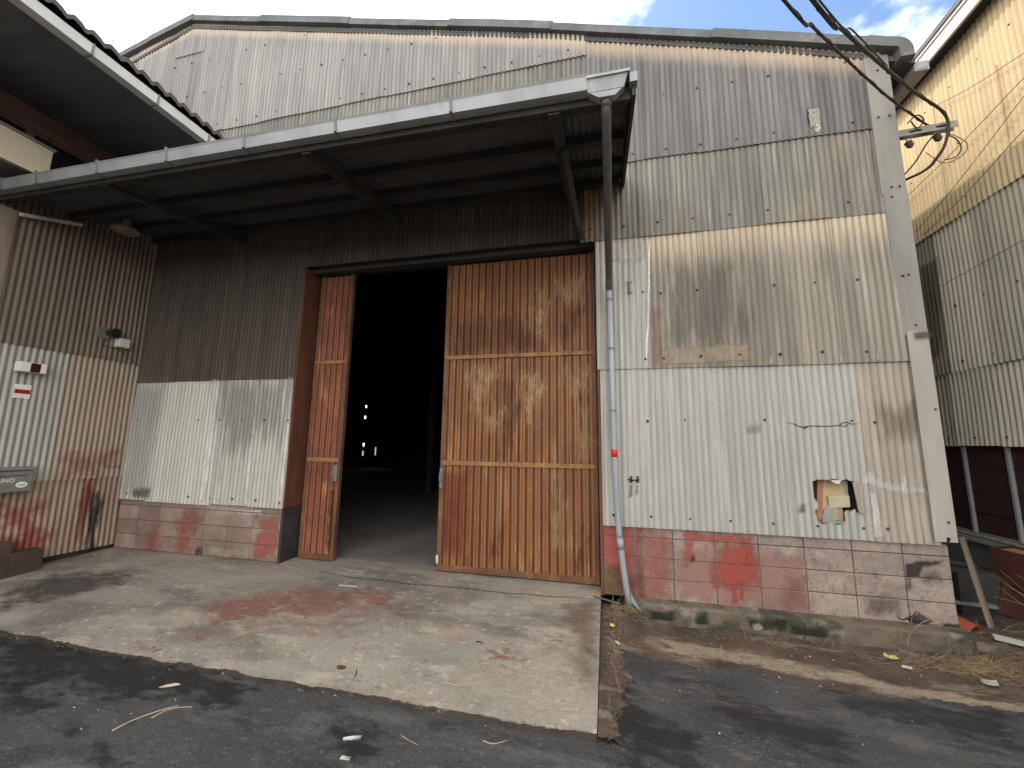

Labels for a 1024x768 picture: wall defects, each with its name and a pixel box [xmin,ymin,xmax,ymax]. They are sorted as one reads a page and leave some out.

peeling [812,473,922,538]